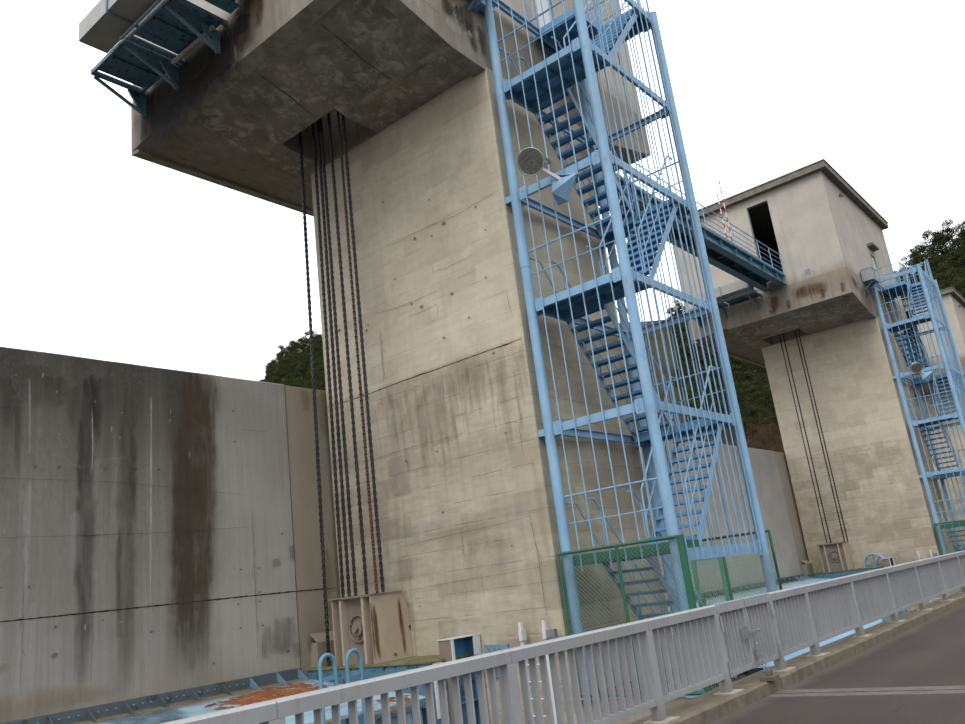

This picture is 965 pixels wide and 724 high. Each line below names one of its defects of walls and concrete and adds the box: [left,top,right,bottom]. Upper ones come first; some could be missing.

rust [770,284,825,312]
water stain [174,374,215,621]
rust [133,683,333,712]